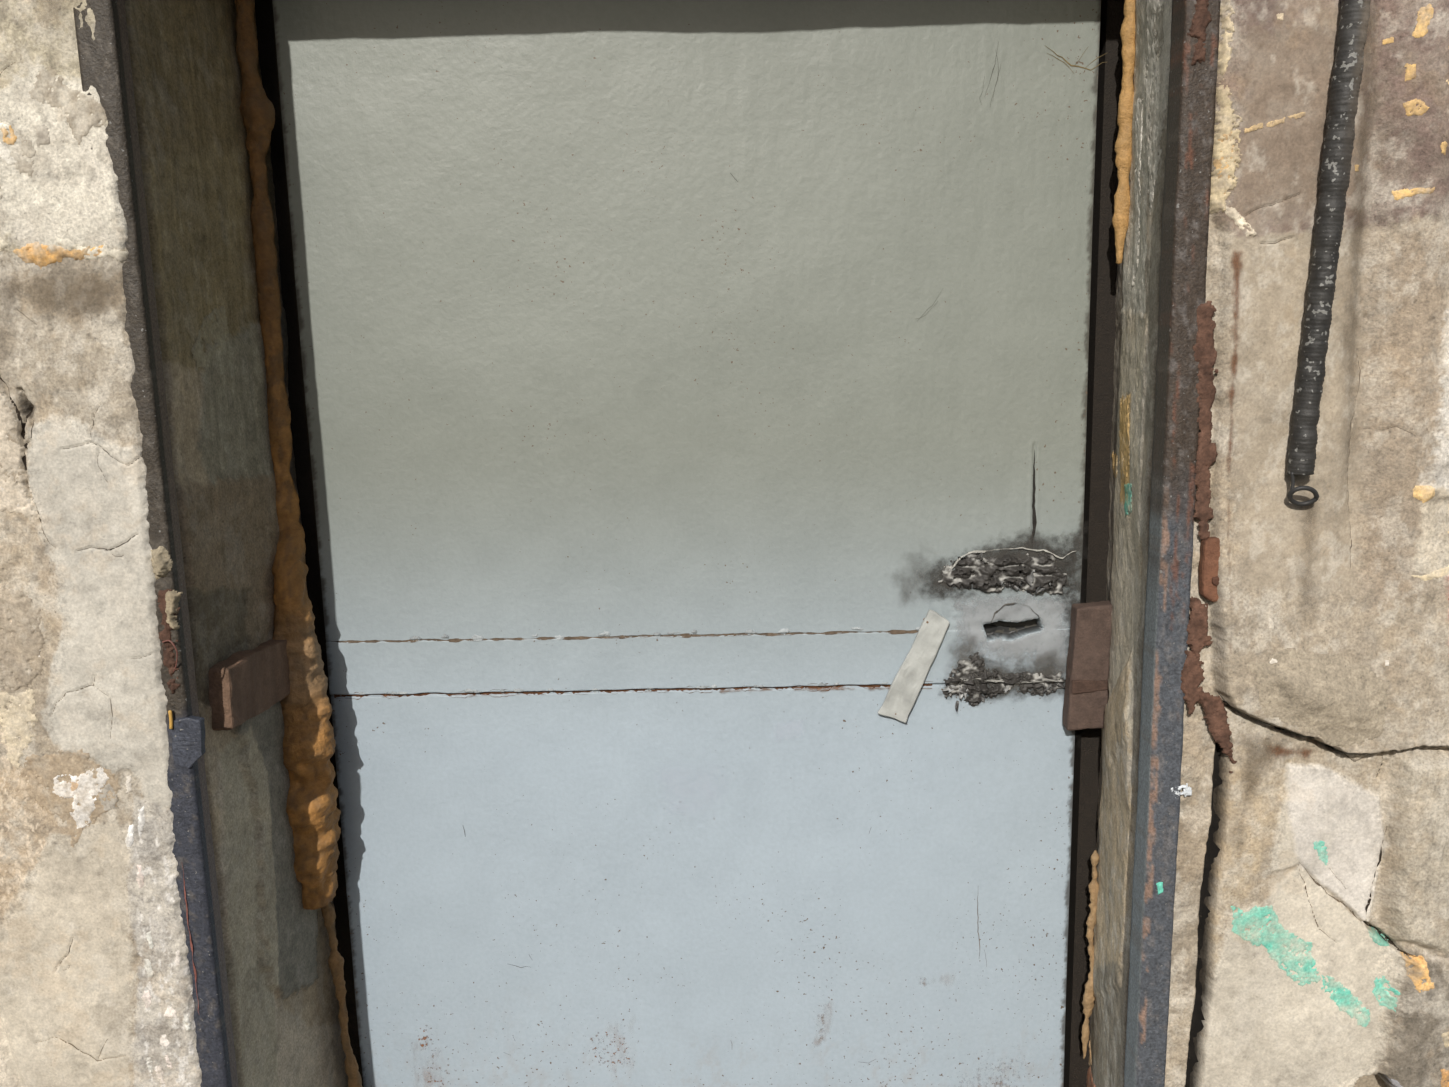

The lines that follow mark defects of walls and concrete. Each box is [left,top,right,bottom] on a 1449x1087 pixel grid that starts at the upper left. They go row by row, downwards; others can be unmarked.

corrosion [1187,0,1212,66]
corrosion [1232,252,1241,316]
crack [0,376,137,557]
corrosion [1193,301,1237,540]
crack [53,678,112,739]
corrosion [1180,596,1237,774]
crack [1219,694,1383,775]
crack [1185,743,1223,1087]
crack [1298,826,1410,956]